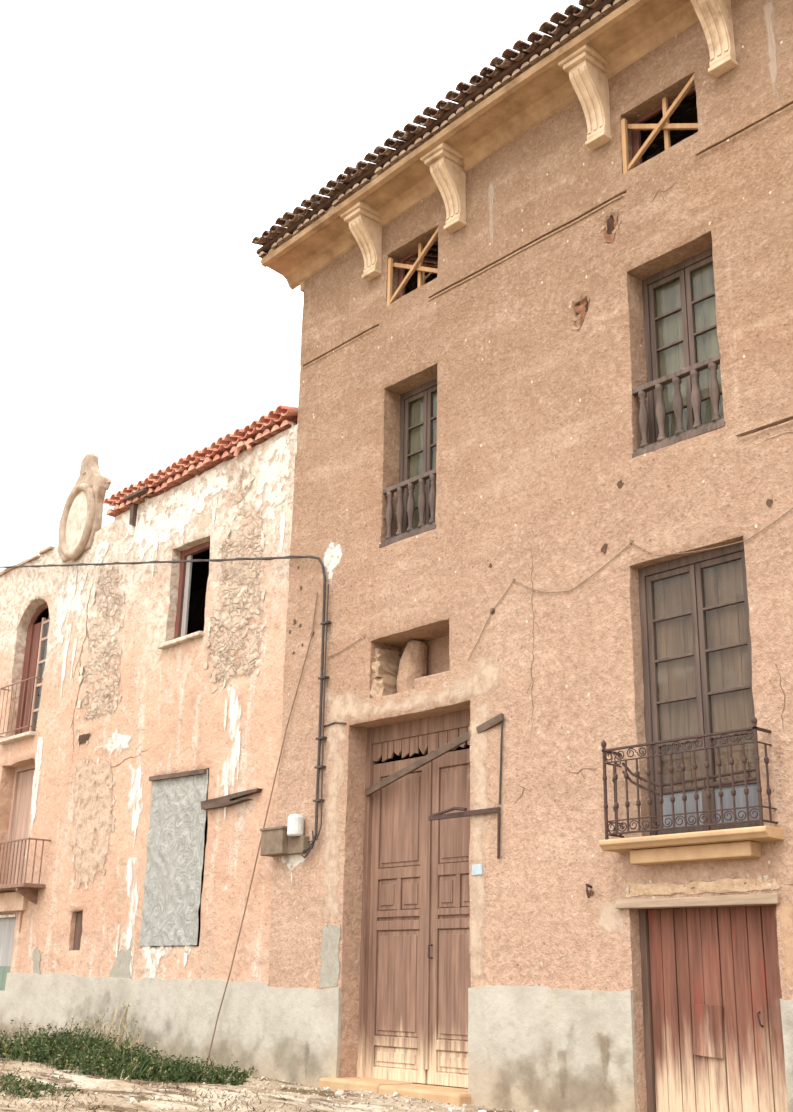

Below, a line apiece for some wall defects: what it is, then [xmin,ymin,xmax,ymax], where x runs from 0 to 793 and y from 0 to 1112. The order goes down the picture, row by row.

spalling [601,212,621,243]
spalling [571,296,590,331]
spalling [52,425,294,889]
water stain [220,685,241,821]
water stain [115,764,171,978]